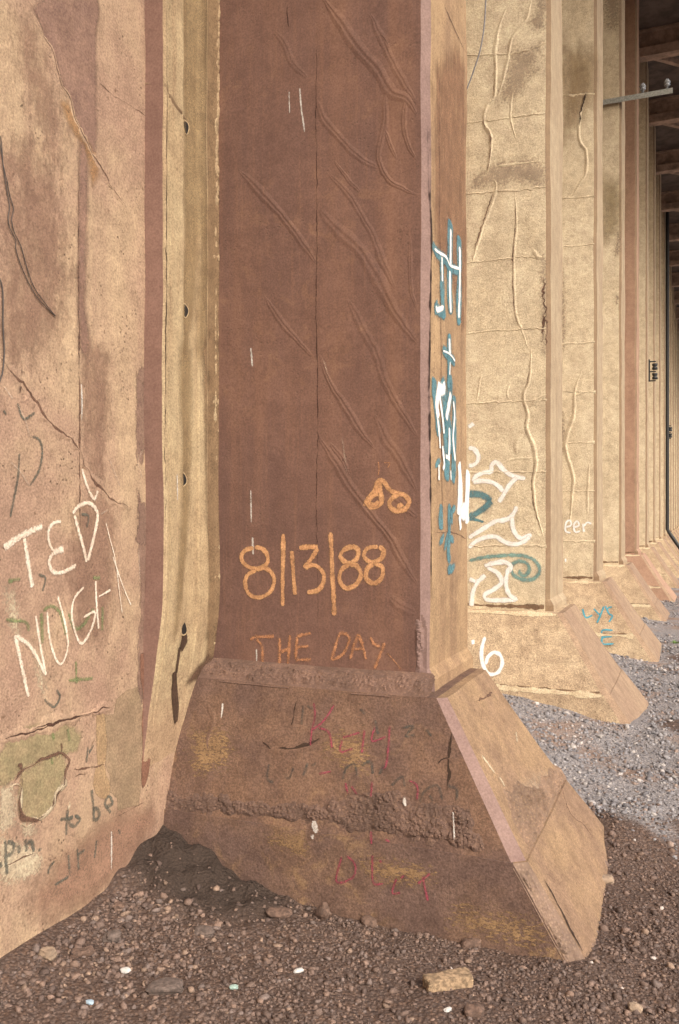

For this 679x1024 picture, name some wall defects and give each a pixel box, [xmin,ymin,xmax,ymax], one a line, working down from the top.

crack [32,12,131,216]
crack [0,191,133,528]
peeling [0,725,81,885]
crack [0,700,113,744]
crack [263,703,319,749]